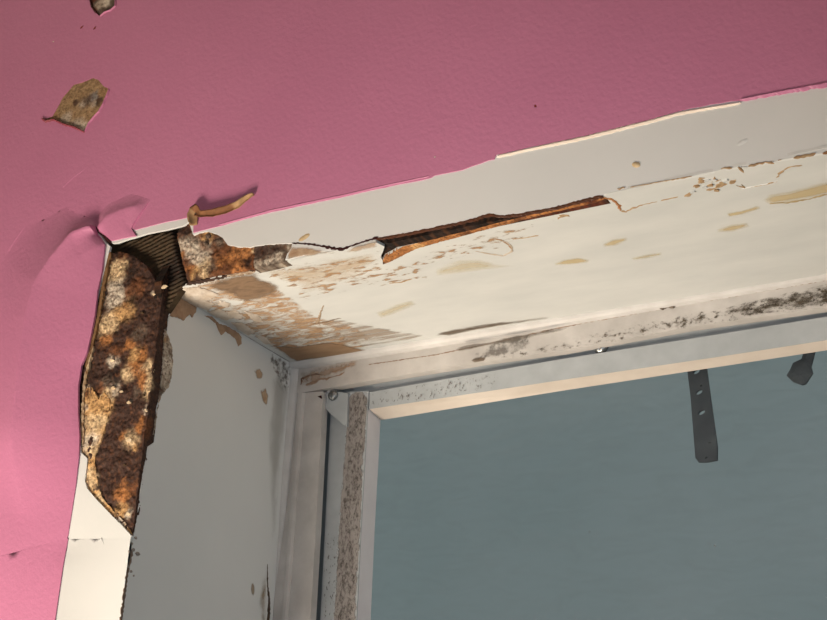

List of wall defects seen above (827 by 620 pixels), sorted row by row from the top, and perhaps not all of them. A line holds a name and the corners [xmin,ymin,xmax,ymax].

spalling [41,78,110,133]
spalling [254,244,292,273]
corrosion [271,236,497,297]
flaking render [170,287,273,346]
leakage [198,276,416,387]
leakage [440,321,522,335]
leakage [458,329,560,362]
leakage [655,288,827,328]
spalling [80,385,133,535]
mould [324,380,479,620]
crack [119,537,140,620]
crack [264,564,272,620]